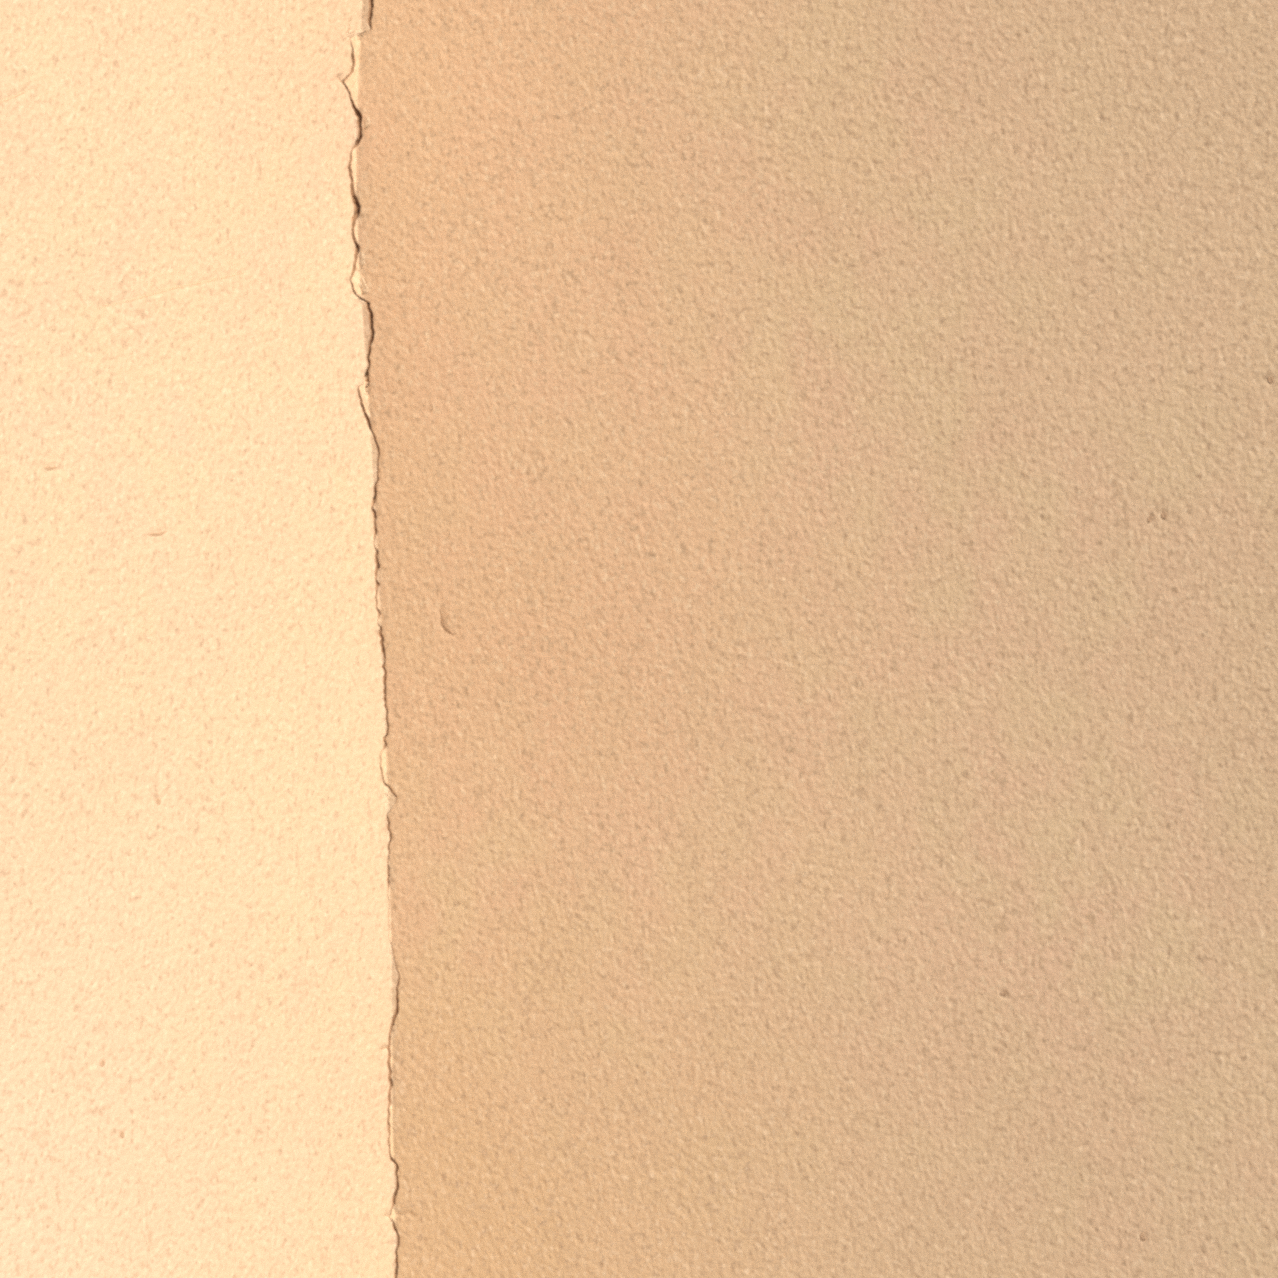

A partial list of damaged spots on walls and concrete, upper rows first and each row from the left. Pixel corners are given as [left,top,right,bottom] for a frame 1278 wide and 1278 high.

crack [338,0,400,1278]